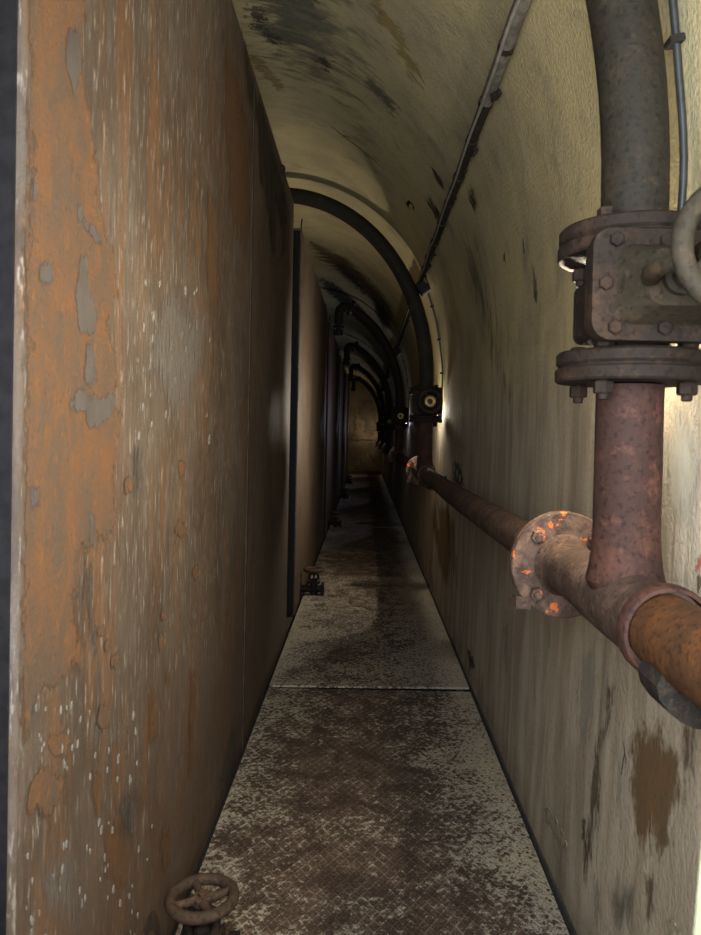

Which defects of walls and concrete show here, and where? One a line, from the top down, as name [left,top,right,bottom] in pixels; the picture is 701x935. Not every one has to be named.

damp [242,0,358,256]
corrosion [19,0,123,747]
corrosion [27,730,71,818]
peeling [94,711,138,785]